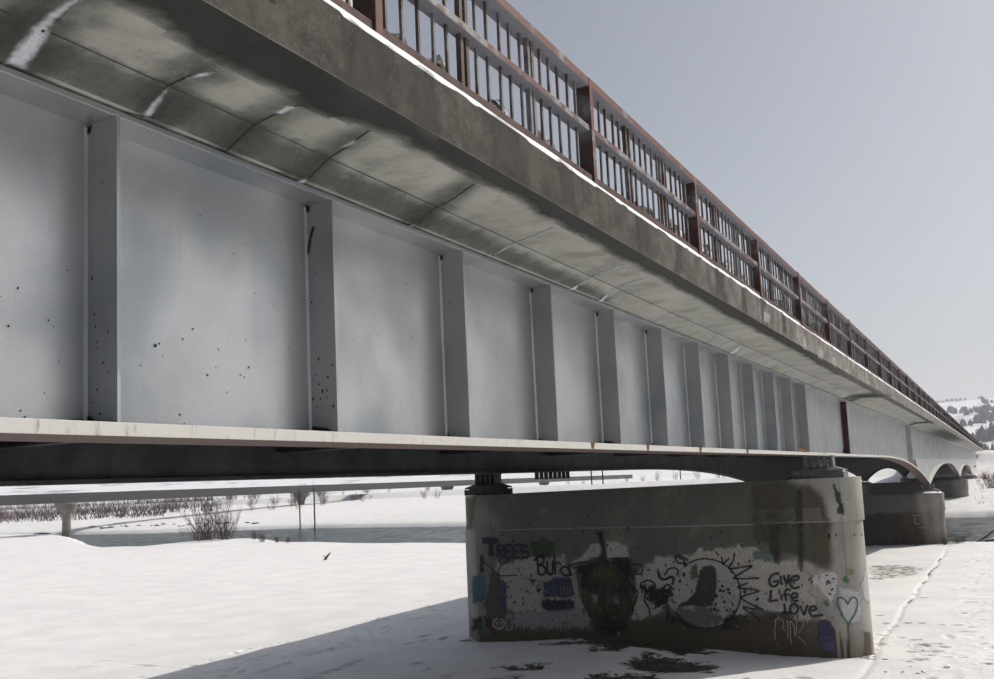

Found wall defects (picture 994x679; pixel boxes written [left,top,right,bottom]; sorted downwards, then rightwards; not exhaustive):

damp [833,485,844,515]
damp [467,483,831,569]
damp [478,614,849,658]